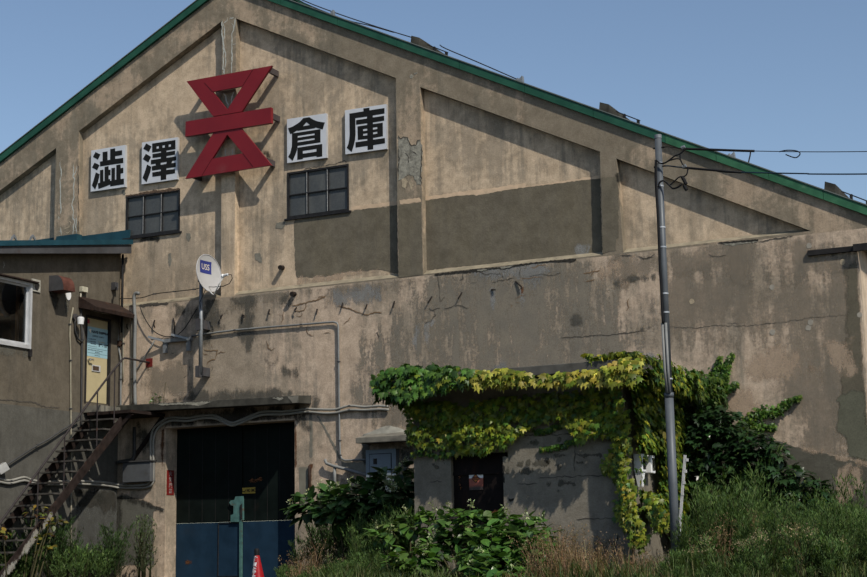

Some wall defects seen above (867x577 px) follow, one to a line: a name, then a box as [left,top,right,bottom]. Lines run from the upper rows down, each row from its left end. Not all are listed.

flaking render [397,136,423,190]
water stain [175,299,220,343]
water stain [230,292,290,351]
crack [426,264,559,323]